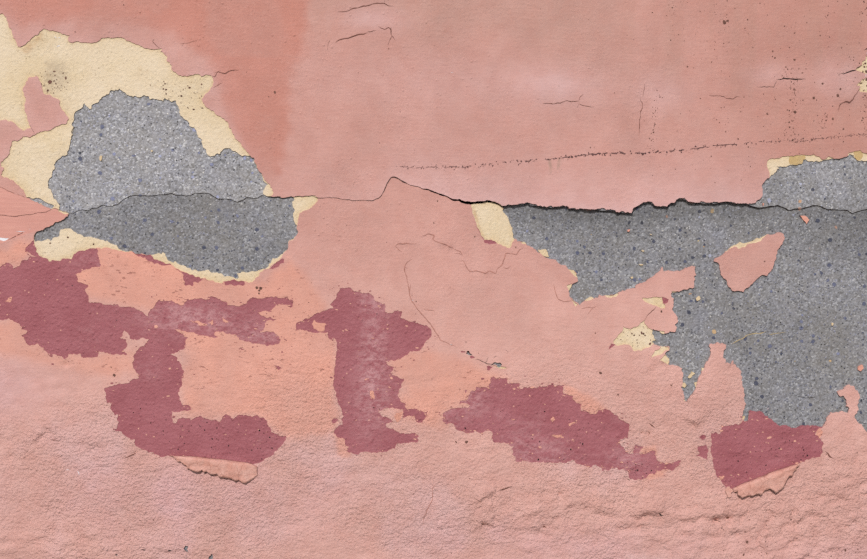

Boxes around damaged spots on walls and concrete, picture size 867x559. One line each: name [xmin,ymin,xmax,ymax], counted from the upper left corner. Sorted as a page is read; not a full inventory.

spalling [0,14,439,483]
crack [1,177,867,240]
crack [396,233,520,347]
spalling [439,151,867,498]